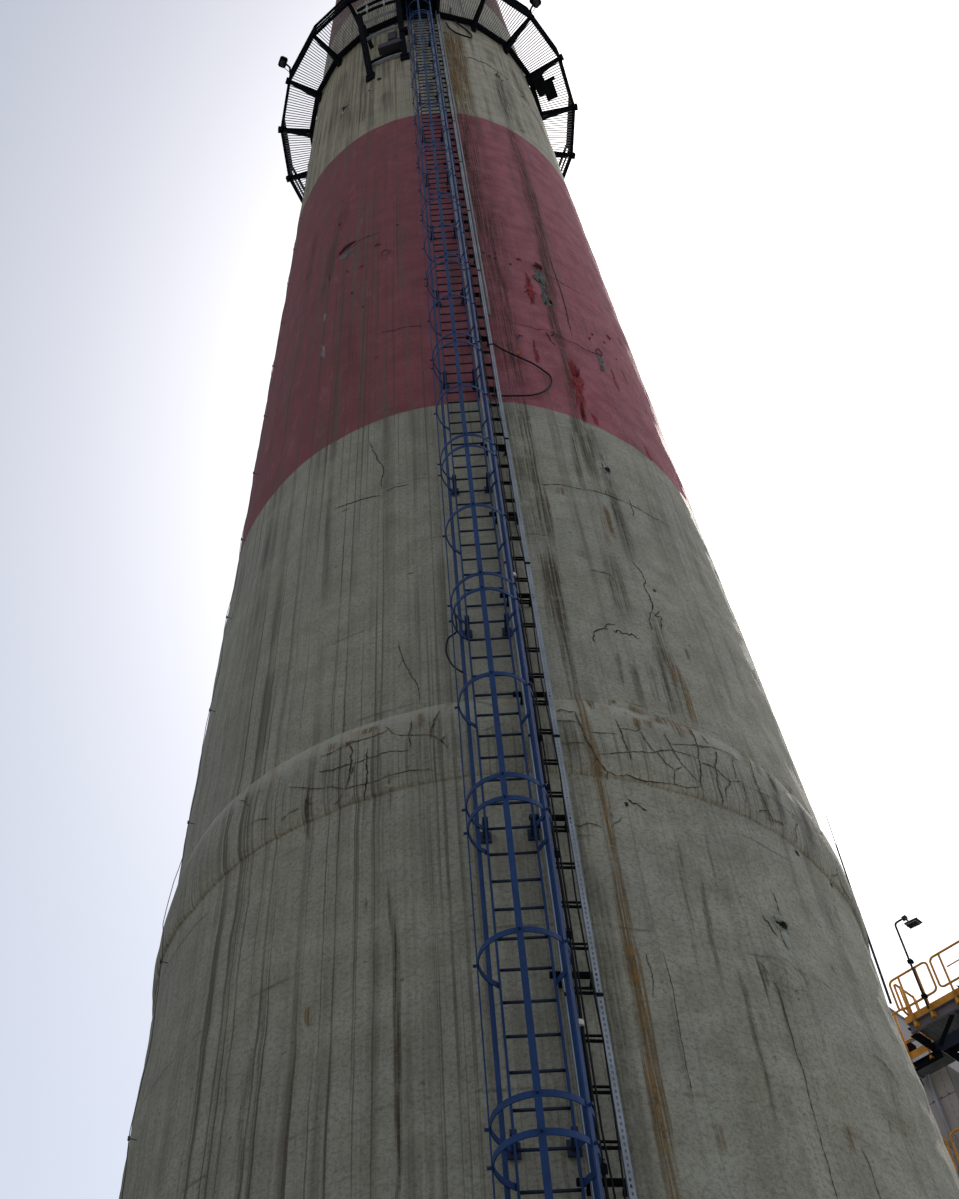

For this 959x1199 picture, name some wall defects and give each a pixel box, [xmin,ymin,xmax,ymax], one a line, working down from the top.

peeling [568,363,599,425]
crack [593,563,662,642]
crack [556,709,822,842]
rust [576,700,675,1199]
spalling [770,916,792,949]